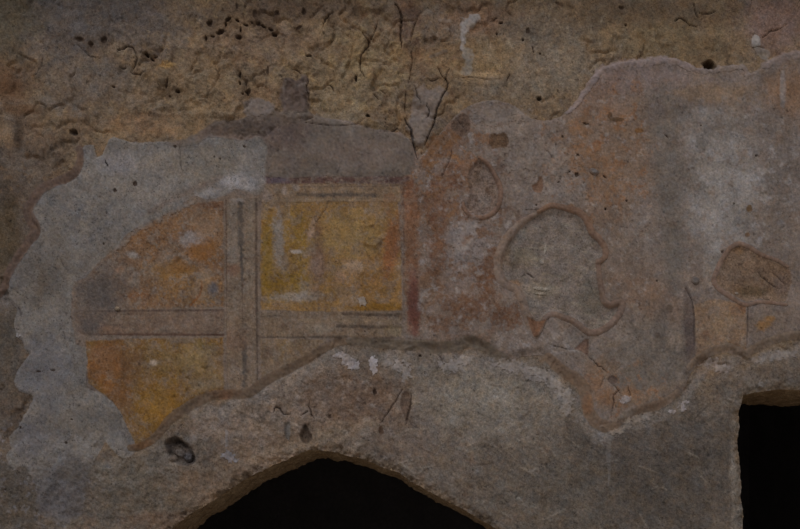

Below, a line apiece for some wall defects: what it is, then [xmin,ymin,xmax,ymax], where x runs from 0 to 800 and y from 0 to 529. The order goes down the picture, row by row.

spalling [64,26,114,54]
spalling [200,0,311,48]
crack [359,21,378,72]
crack [391,4,487,159]
spalling [489,132,509,149]
crack [590,358,631,417]
spalling [155,436,196,473]
spalling [284,422,313,444]